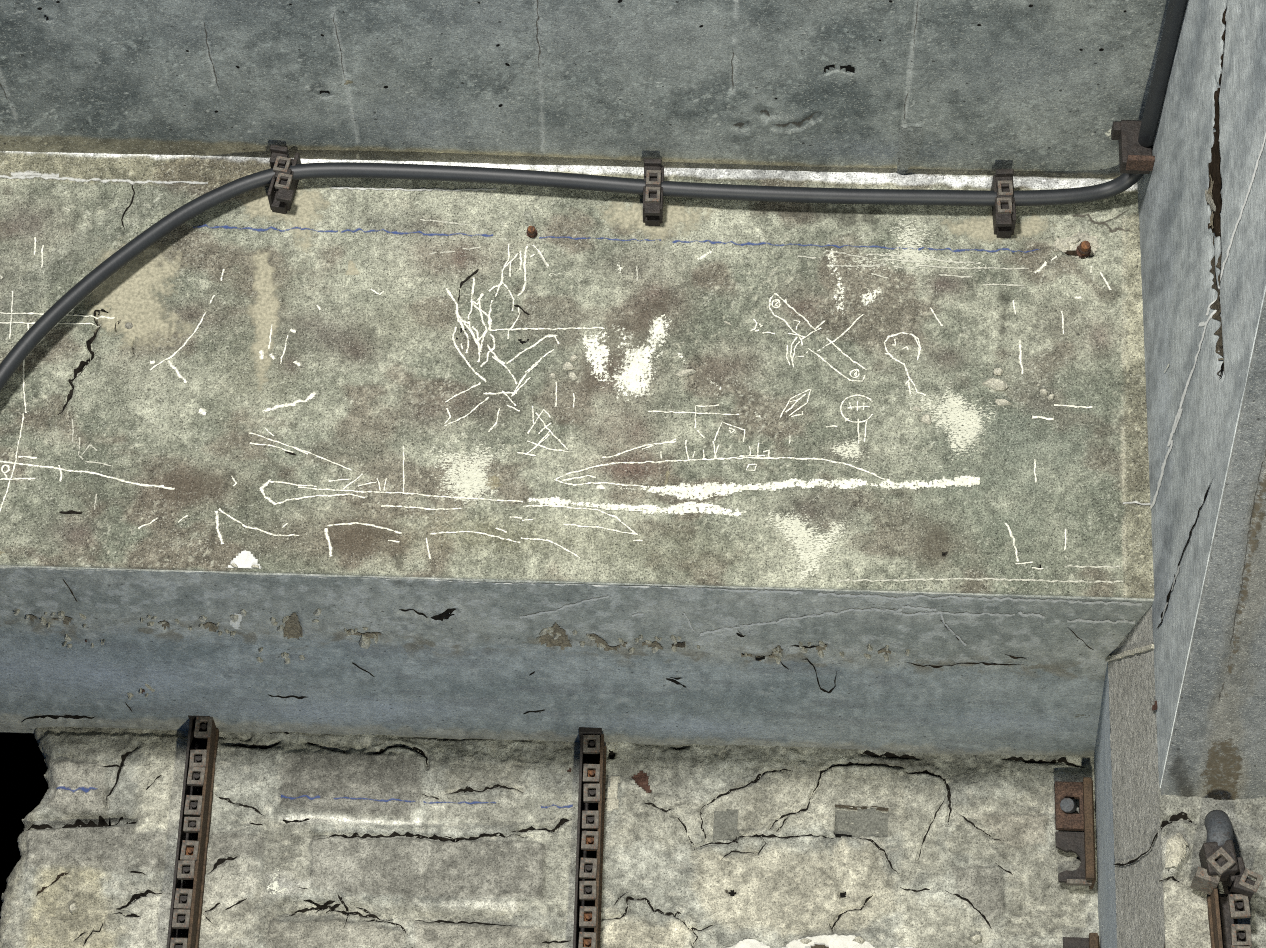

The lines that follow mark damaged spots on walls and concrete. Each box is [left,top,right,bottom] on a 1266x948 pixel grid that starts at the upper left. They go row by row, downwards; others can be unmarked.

crack [1209,232,1225,376]
crack [57,309,134,415]
spalling [13,609,105,648]
spalling [140,614,238,637]
spalling [270,608,321,664]
spalling [344,627,381,649]
spalling [536,623,700,654]
spalling [741,646,783,664]
crack [27,747,161,831]
crack [215,794,575,842]
crack [646,751,1013,932]
crack [280,886,510,948]